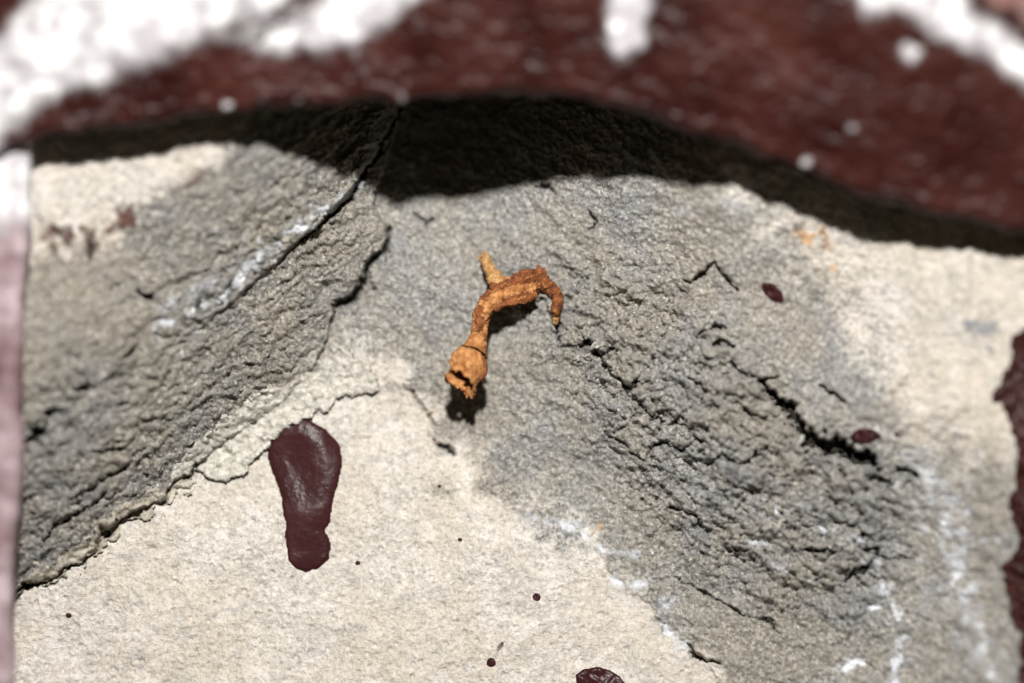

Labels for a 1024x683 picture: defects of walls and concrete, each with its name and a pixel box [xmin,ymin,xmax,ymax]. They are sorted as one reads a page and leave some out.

crack [305,106,402,237]
water stain [187,205,330,317]
crack [334,228,391,308]
peeling [25,342,380,587]
spalling [571,332,609,380]
spalling [611,359,804,522]
crack [700,324,917,491]
spalling [785,478,868,585]